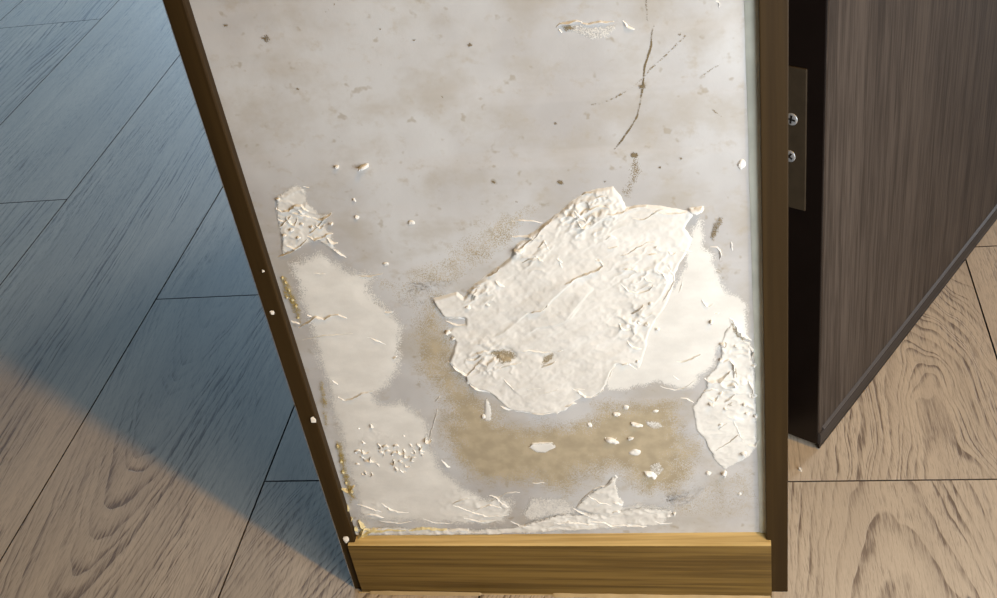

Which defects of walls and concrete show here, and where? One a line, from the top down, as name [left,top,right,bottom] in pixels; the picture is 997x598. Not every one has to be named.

peeling [557,20,635,39]
crack [615,0,653,149]
flaking render [275,183,346,258]
spalling [486,350,516,372]
damp [377,205,758,519]